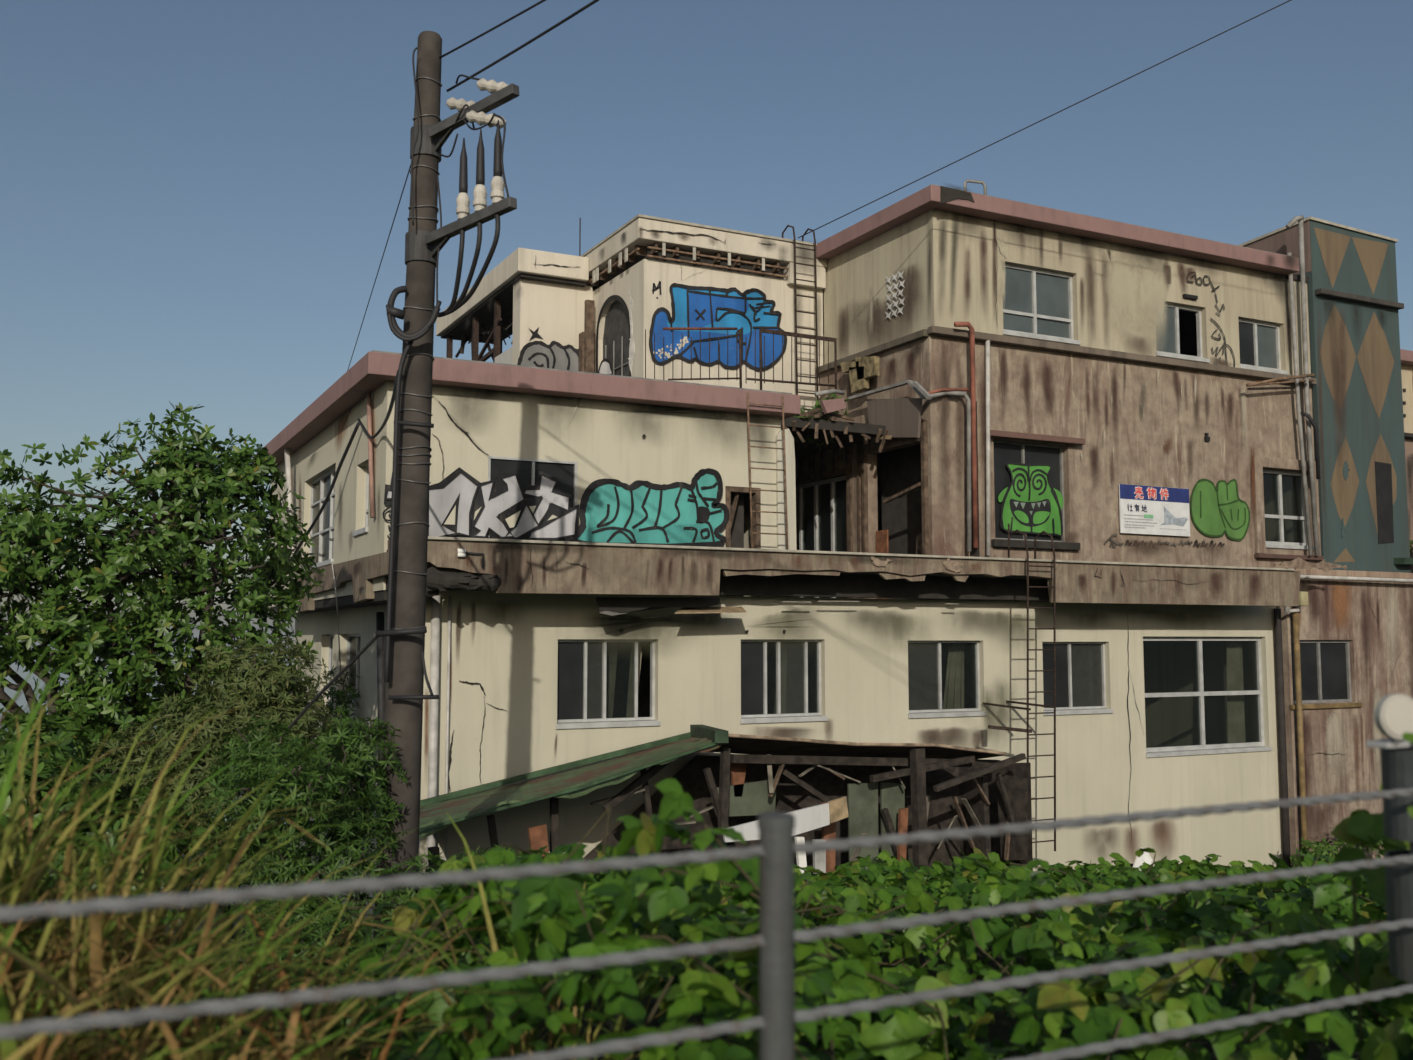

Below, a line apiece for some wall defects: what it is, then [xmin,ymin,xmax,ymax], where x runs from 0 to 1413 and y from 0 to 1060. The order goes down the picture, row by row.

water stain [866,215,969,338]
water stain [1081,261,1108,313]
water stain [1139,248,1165,326]
corrosion [1025,364,1052,401]
corrosion [1087,367,1126,422]
crack [432,401,489,477]
corrosion [1092,448,1114,479]
corrosion [1132,540,1161,550]
corrosion [1299,583,1328,621]
corrosion [1363,597,1379,655]
crack [448,681,506,793]
corrosion [1297,719,1310,797]